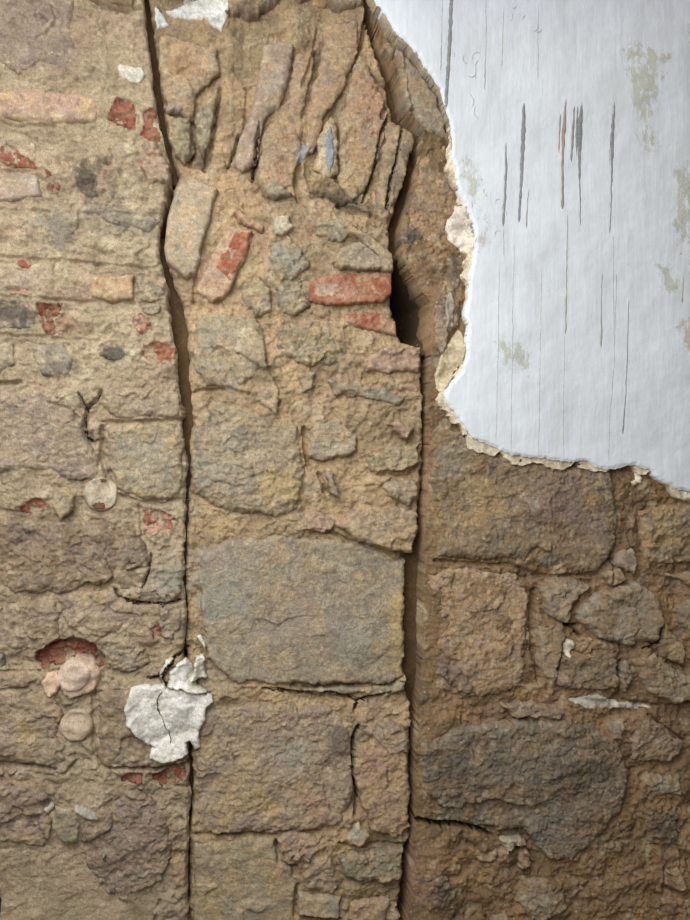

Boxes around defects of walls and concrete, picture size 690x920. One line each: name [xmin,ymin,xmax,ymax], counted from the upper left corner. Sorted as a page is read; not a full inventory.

spalling [108,96,160,143]
crack [144,1,179,186]
damp [627,48,669,117]
spalling [0,143,60,195]
crack [228,127,260,183]
crack [361,71,414,260]
damp [674,161,690,240]
spalling [216,232,254,280]
crack [115,239,194,920]
spalling [36,637,105,669]
peeling [160,634,208,694]
crack [265,511,419,811]